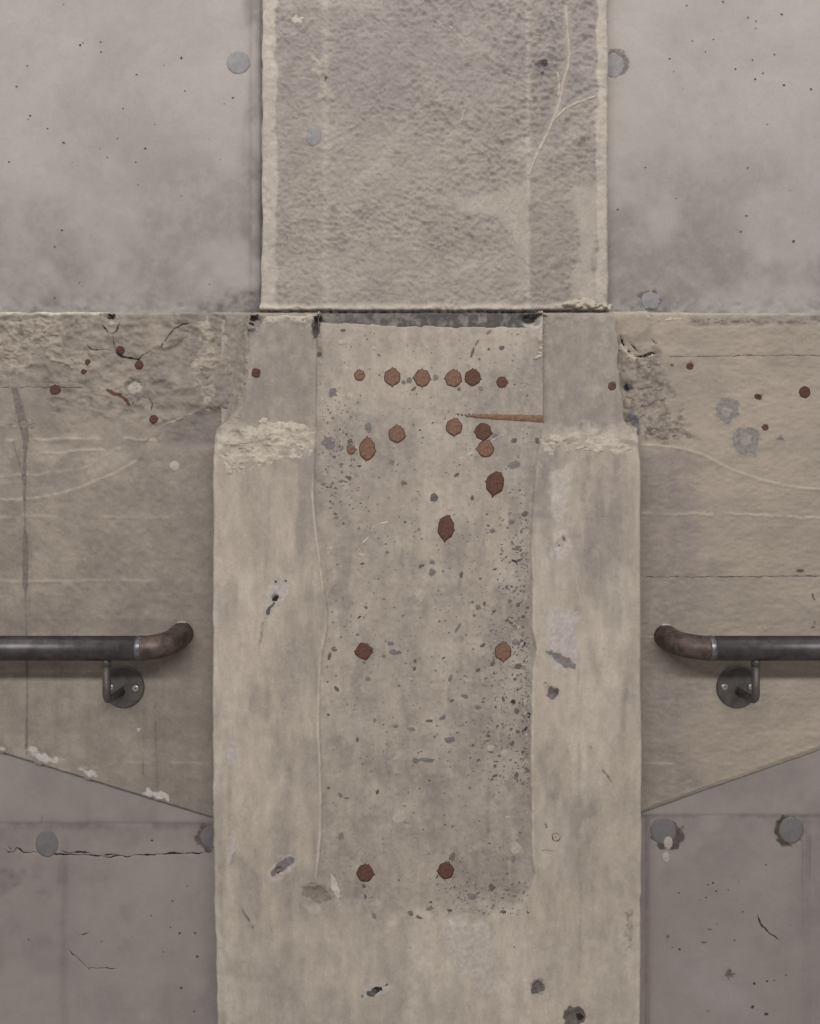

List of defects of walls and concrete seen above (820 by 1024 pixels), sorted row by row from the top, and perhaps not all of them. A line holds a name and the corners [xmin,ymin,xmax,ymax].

crack [88,322,193,360]
rust [446,417,494,457]
spalling [218,297,691,919]
damp [136,699,170,803]
crack [7,847,205,858]